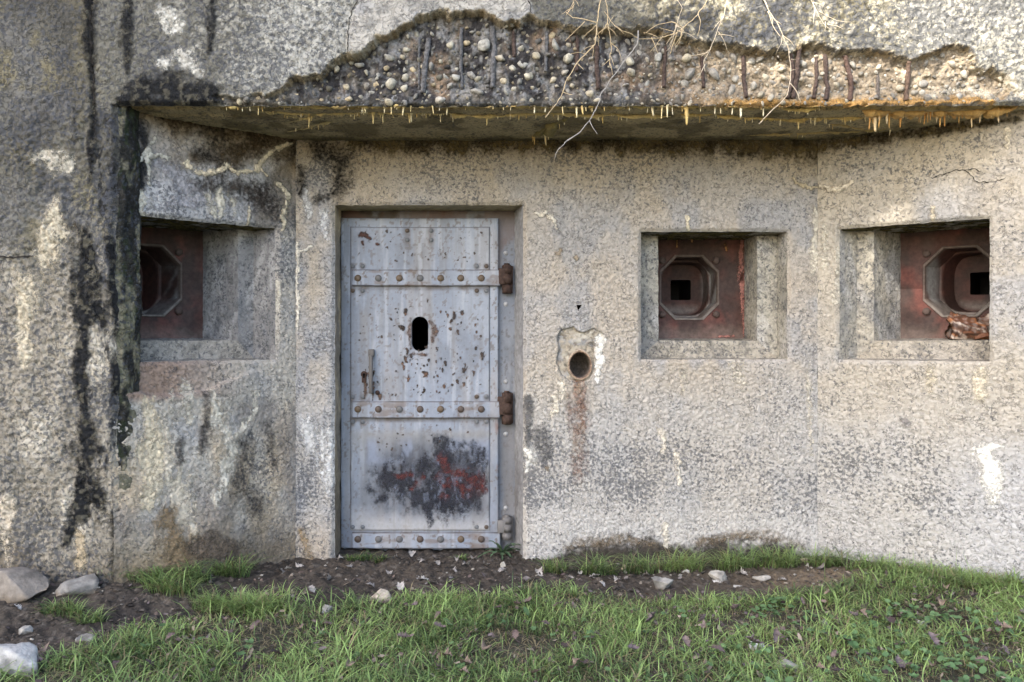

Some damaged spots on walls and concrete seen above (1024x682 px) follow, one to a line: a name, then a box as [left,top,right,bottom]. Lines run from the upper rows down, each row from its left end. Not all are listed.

spalling [218,11,1014,109]
corrosion [724,97,995,108]
damp [160,72,1024,240]
crack [933,168,1006,183]
crack [140,136,313,330]
damp [15,273,38,368]
damp [34,198,120,570]
damp [135,379,263,572]
damp [300,415,335,494]
corrosion [363,306,485,401]
corrosion [568,379,586,474]
spalling [557,326,601,383]